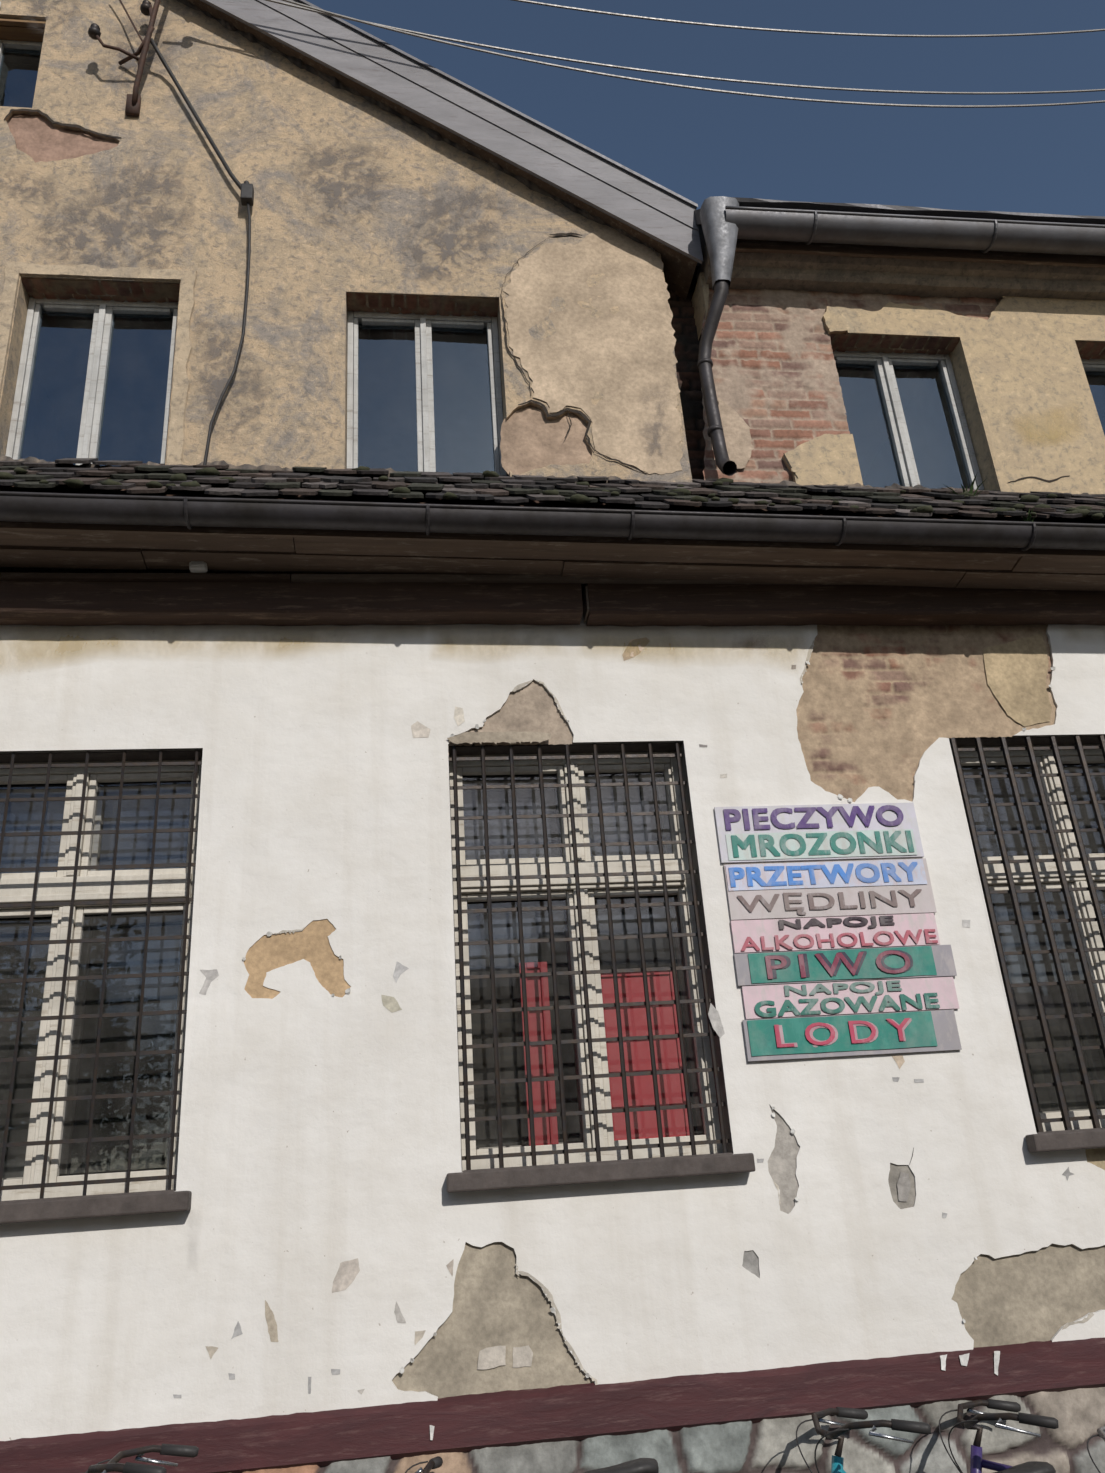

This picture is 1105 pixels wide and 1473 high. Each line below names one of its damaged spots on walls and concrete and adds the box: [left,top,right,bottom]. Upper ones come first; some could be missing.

spalling [4,109,122,163]
flaking render [701,288,1006,495]
spalling [500,405,592,476]
peeling [411,721,431,738]
spalling [447,680,573,756]
flaking render [791,624,1056,802]
peeling [242,919,351,999]
peeling [757,1107,800,1214]
peeling [888,1148,916,1209]
spalling [392,1242,598,1399]
spalling [952,1244,1105,1348]